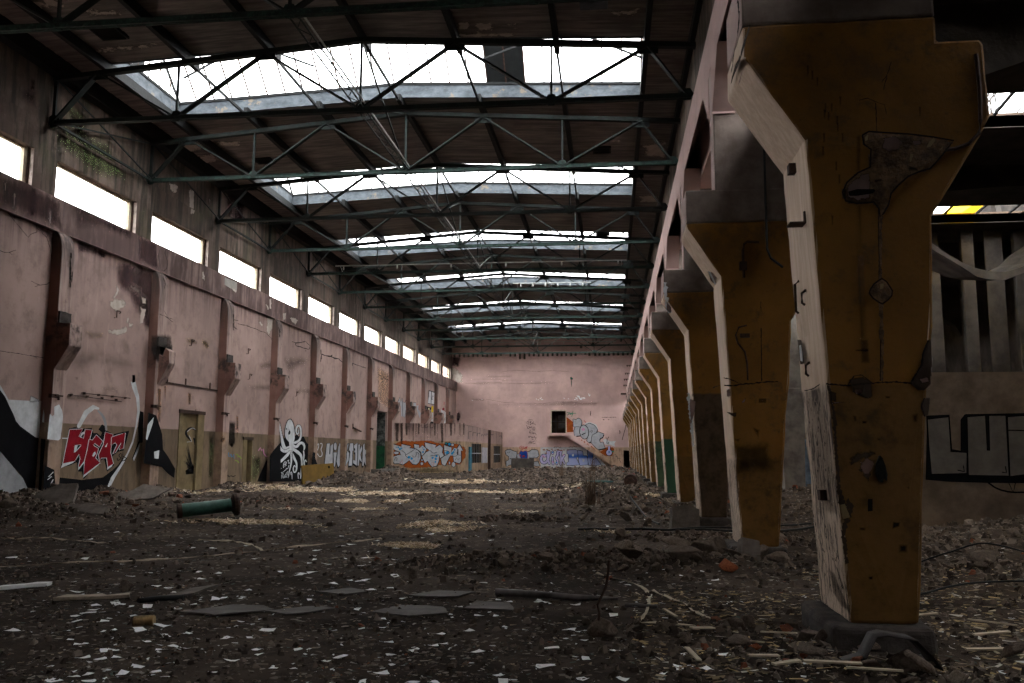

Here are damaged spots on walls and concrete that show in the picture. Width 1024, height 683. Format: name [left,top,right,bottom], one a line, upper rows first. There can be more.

peeling [108,285,146,335]
spalling [911,339,932,421]